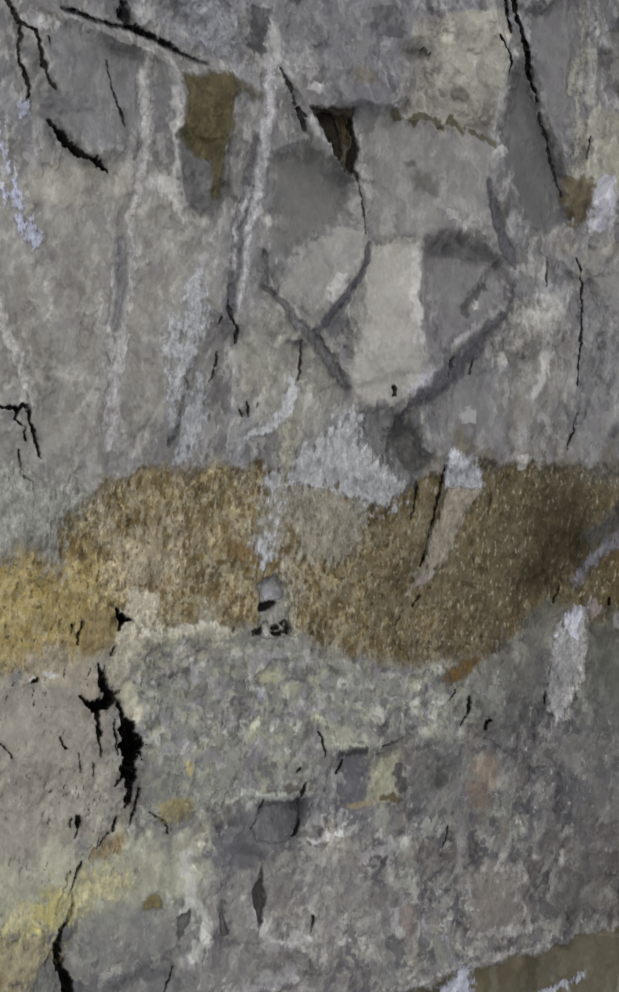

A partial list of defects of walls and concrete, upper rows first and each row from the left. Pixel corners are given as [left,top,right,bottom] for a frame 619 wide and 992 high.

crack [5,0,57,101]
crack [46,119,108,173]
spalling [311,107,358,174]
crack [500,0,562,198]
crack [0,403,41,479]
damp [0,458,92,569]
damp [244,375,409,637]
damp [444,448,483,490]
damp [107,626,238,698]
damp [554,596,602,719]
crack [59,608,168,890]
crack [46,917,73,992]